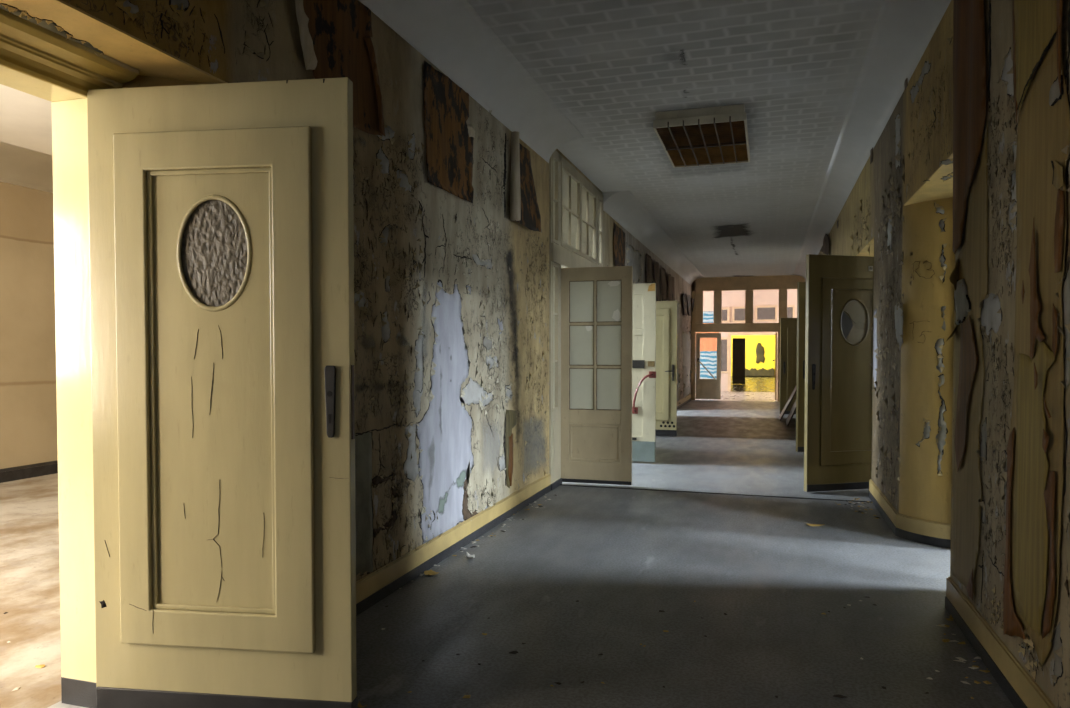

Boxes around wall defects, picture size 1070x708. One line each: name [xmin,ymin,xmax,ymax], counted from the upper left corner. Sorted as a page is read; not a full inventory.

peeling [0,3,104,55]
flaking render [353,151,513,577]
peeling [916,306,960,476]
peeling [976,48,1019,568]
peeling [1056,269,1070,389]